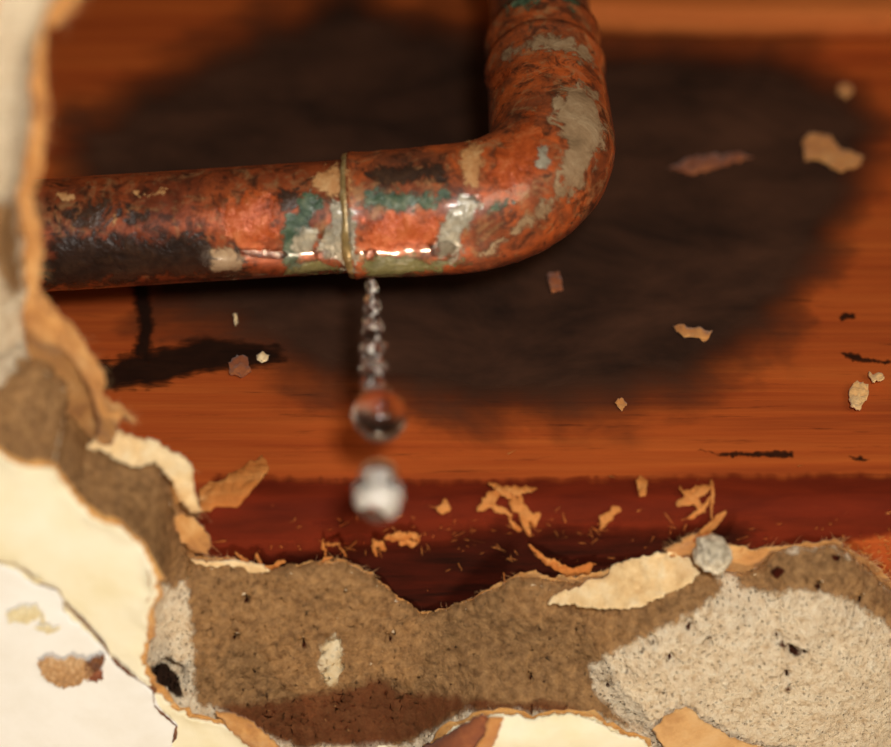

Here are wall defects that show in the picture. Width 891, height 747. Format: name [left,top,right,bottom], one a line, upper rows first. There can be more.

leakage [98,285,286,389]
crack [0,562,178,743]
spalling [775,632,807,655]
spalling [37,654,105,689]
peeling [488,712,652,747]